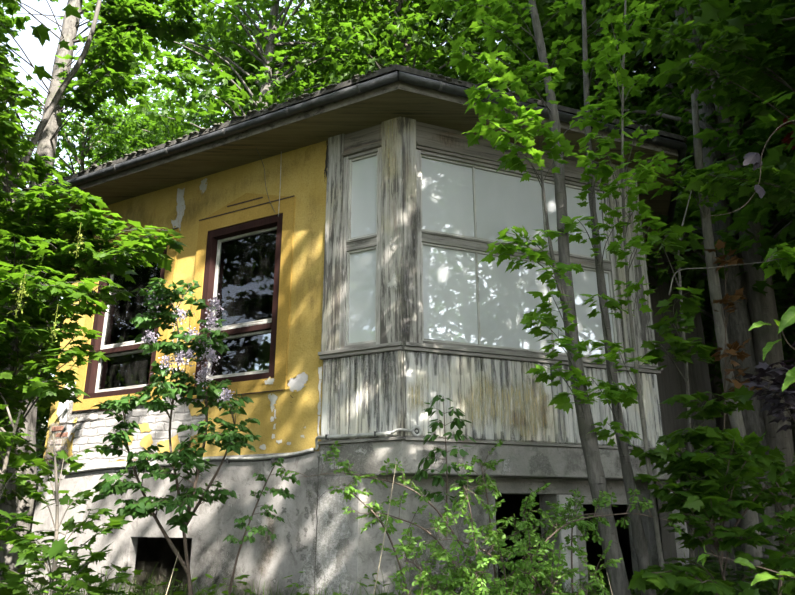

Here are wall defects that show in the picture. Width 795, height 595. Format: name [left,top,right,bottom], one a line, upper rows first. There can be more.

peeling [171,188,186,231]
peeling [287,372,309,392]
water stain [460,356,543,385]
spalling [43,381,205,467]
peeling [251,377,291,451]